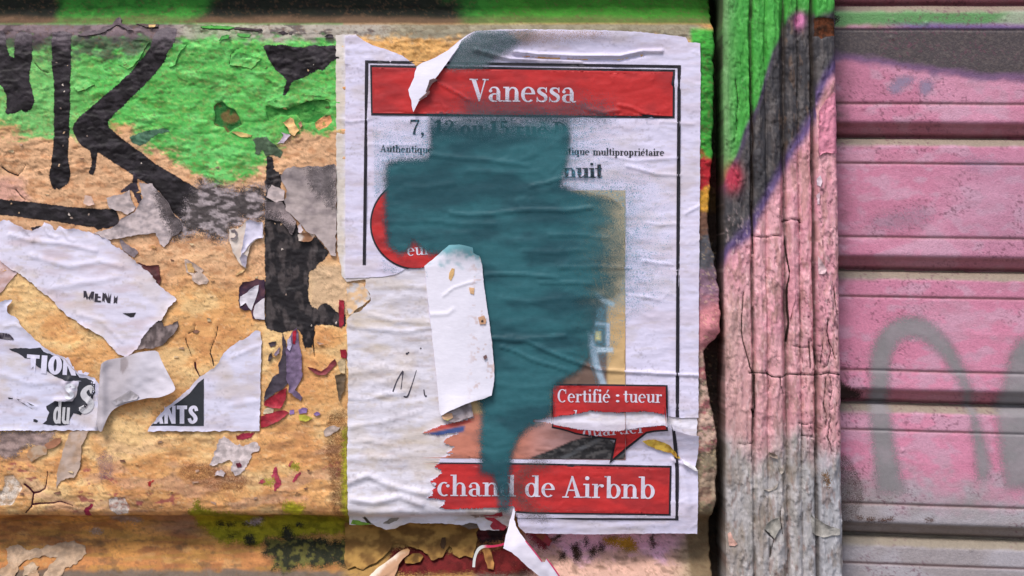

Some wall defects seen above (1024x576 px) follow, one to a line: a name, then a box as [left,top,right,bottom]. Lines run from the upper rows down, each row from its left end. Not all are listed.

spalling [214,101,252,138]
spalling [266,94,332,144]
peeling [120,239,161,285]
peeling [184,259,209,285]
crack [735,68,840,462]
peeling [335,300,345,328]
crack [185,326,218,377]
crack [24,471,73,513]
peeling [0,541,87,576]